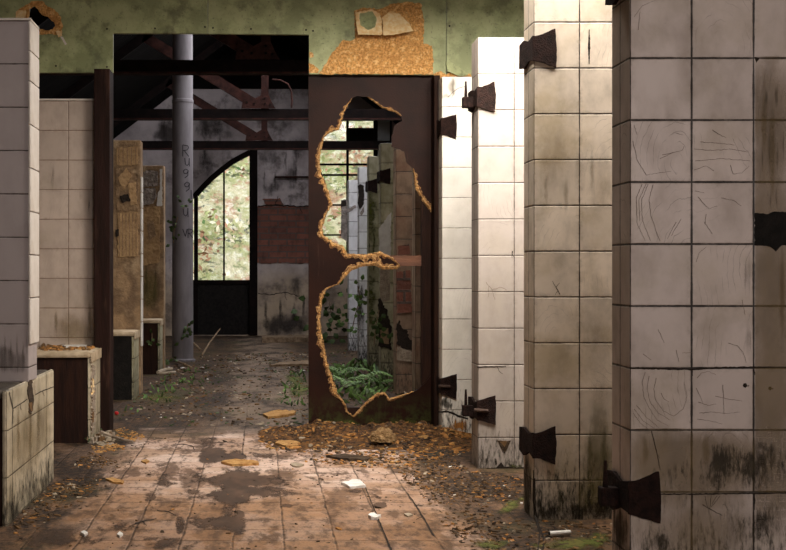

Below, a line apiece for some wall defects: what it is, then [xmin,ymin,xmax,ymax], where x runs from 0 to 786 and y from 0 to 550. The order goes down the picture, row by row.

peeling [309,2,472,78]
crack [633,126,749,241]
flaking render [257,198,308,264]
spalling [379,213,410,256]
damp [265,302,305,335]
flaking render [377,268,412,362]
crack [633,354,740,467]
damp [18,524,139,547]
damp [145,437,295,549]
damp [519,455,627,550]
damp [639,440,786,491]